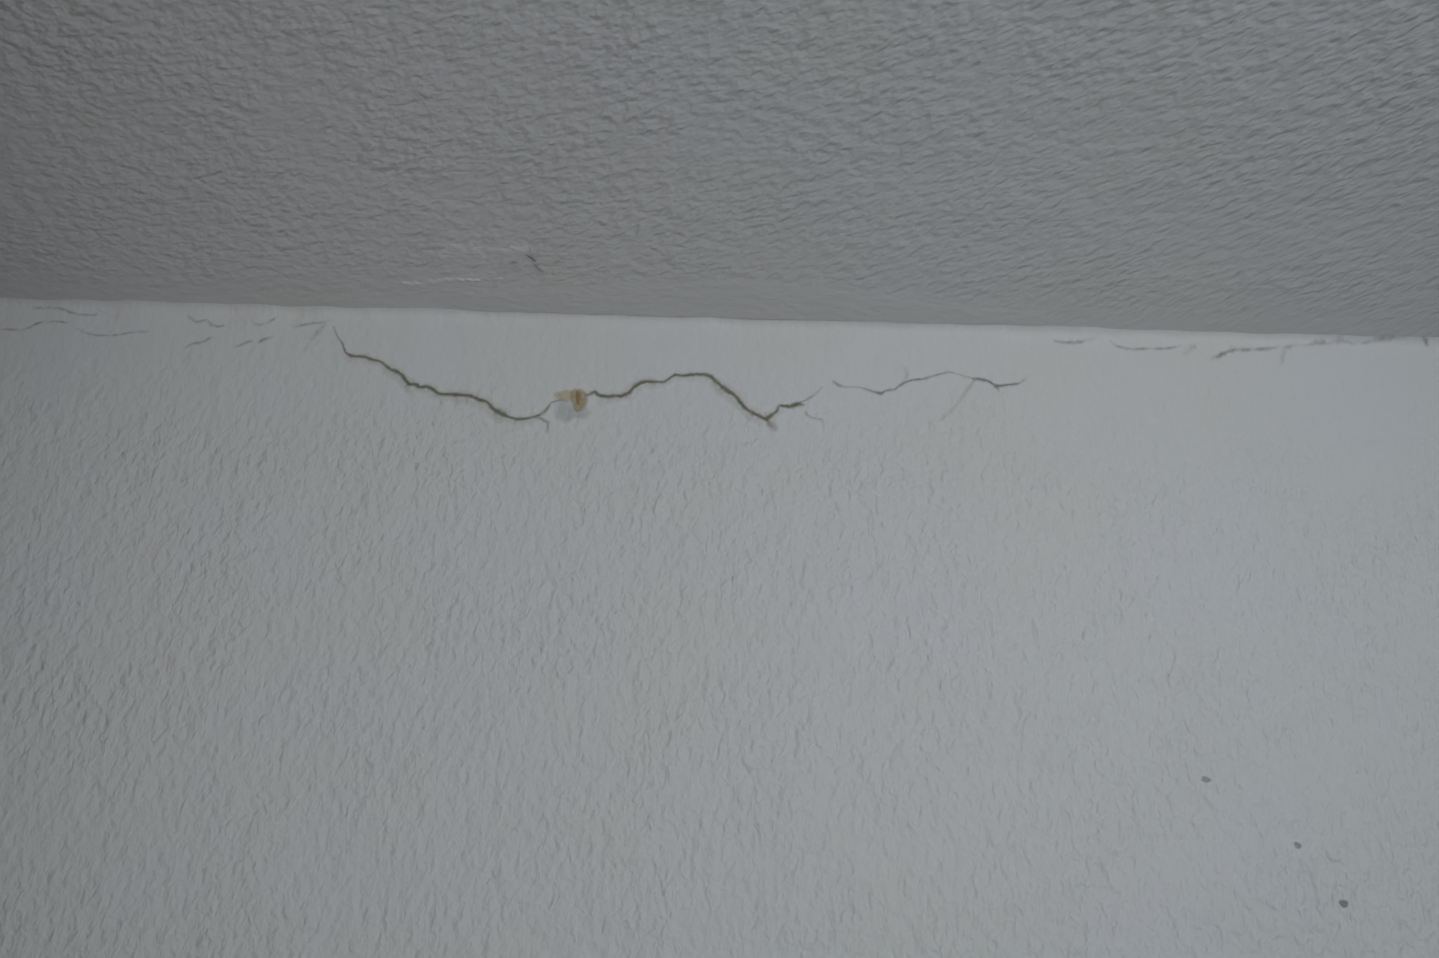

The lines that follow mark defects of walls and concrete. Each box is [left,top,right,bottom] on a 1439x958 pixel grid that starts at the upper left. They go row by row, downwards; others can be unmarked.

crack [344,349,547,420]
crack [589,373,801,420]